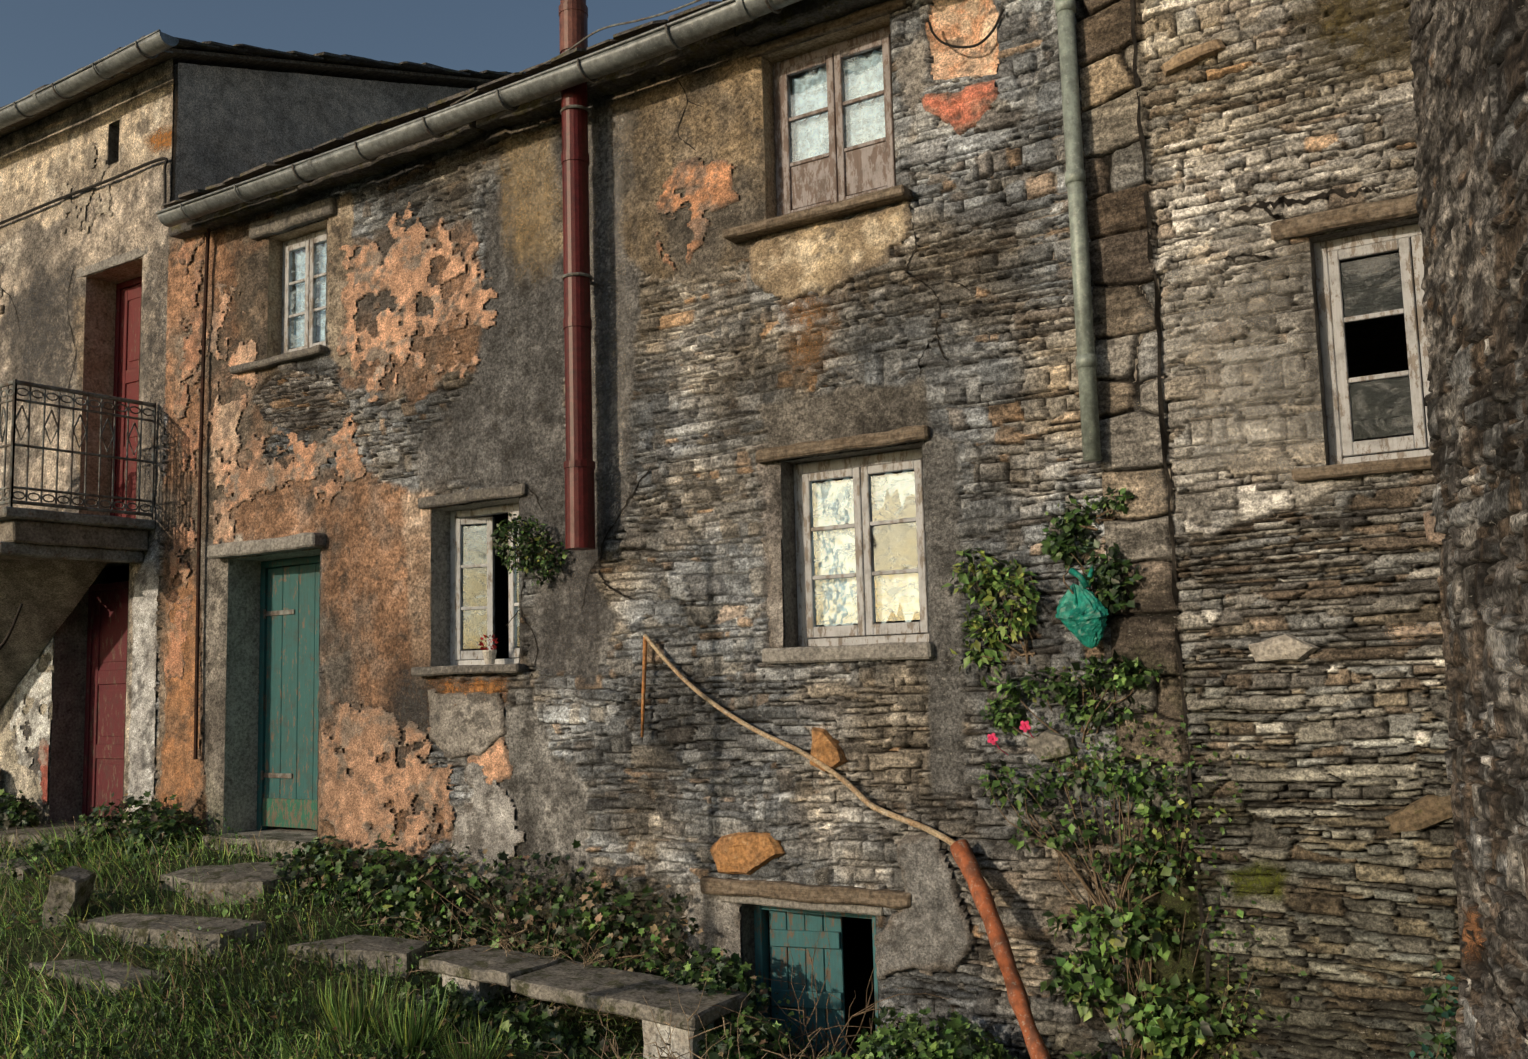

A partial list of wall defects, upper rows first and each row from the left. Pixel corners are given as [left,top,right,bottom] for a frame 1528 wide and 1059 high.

spalling [919,0,1000,135]
flaking render [655,156,740,272]
flaking render [127,202,498,818]
flaking render [319,688,525,882]